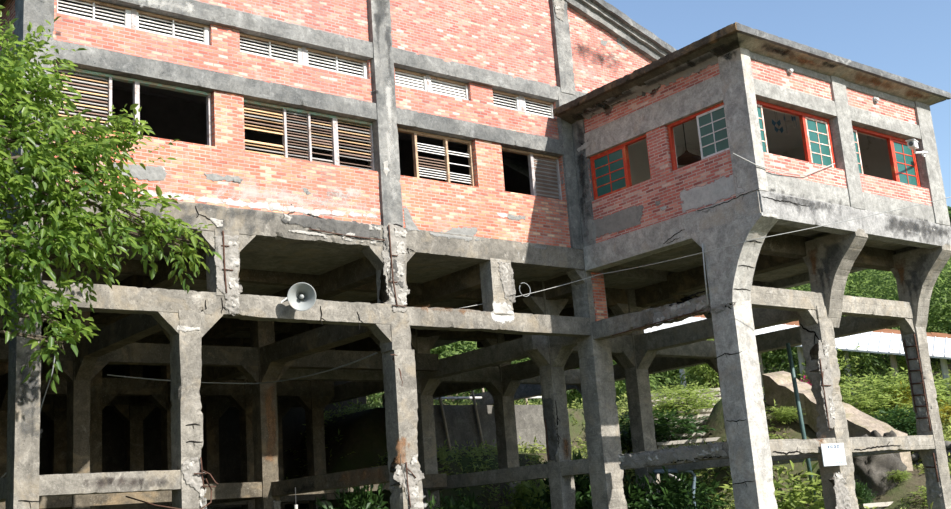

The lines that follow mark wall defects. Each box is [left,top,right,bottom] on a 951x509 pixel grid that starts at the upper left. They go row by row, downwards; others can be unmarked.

leakage [890,217,949,237]
spalling [127,190,410,317]
spalling [491,261,516,324]
crack [800,324,820,344]
spalling [177,457,216,509]
spalling [390,454,425,509]
spalling [828,472,852,509]